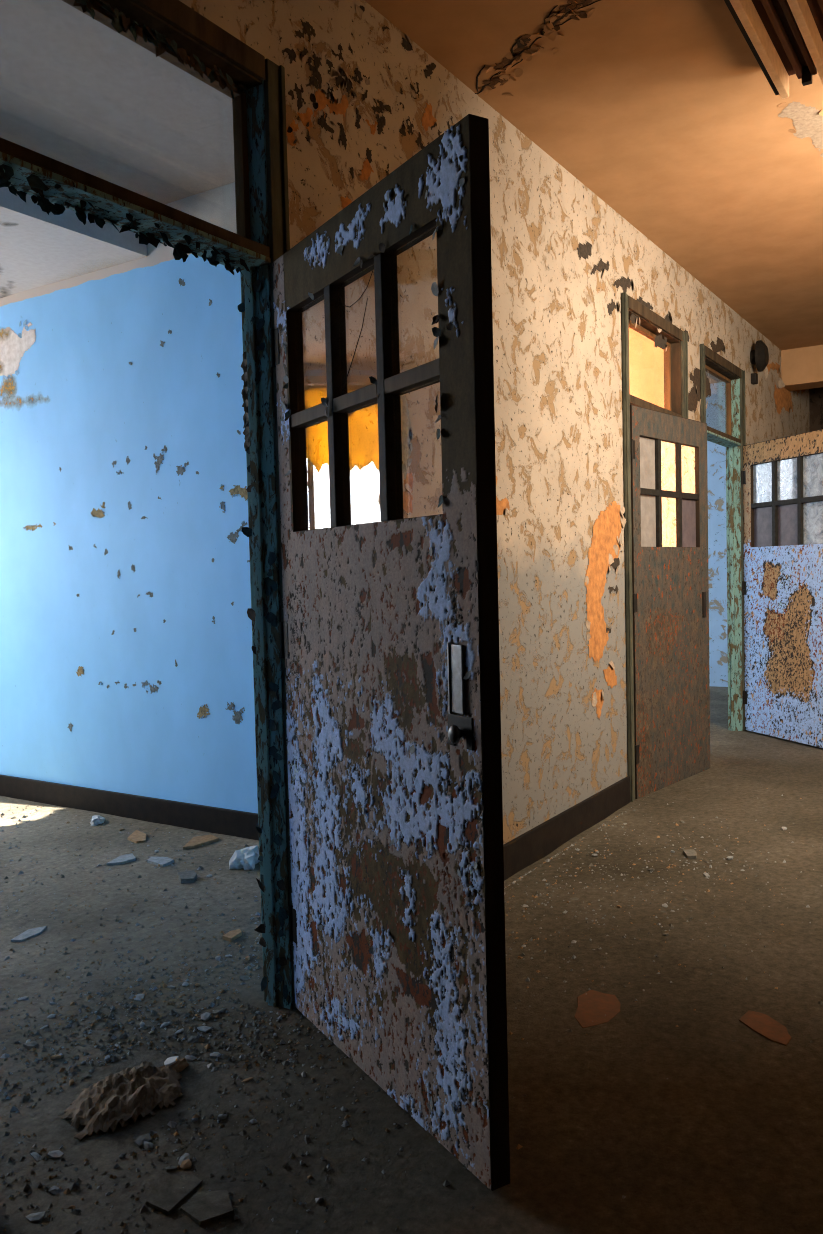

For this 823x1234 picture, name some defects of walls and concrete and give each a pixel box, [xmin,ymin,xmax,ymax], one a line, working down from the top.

crack [475,0,601,96]
peeling [0,19,491,1190]
spalling [496,476,510,515]
peeling [743,429,823,748]